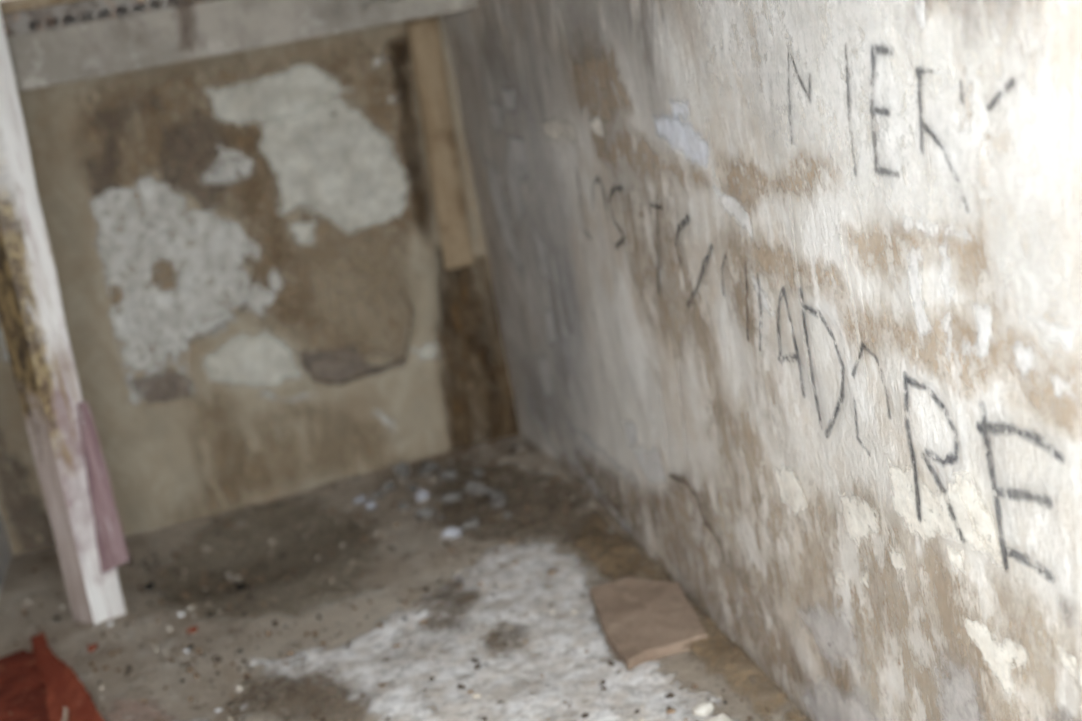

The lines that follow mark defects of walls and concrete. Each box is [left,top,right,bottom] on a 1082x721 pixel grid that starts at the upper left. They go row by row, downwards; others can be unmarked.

peeling [200,64,408,245]
peeling [90,176,300,404]
peeling [558,376,879,721]
water stain [705,486,992,721]
peeling [937,662,979,721]
peeling [966,620,1026,694]
water stain [1008,608,1058,711]
peeling [1057,646,1076,675]